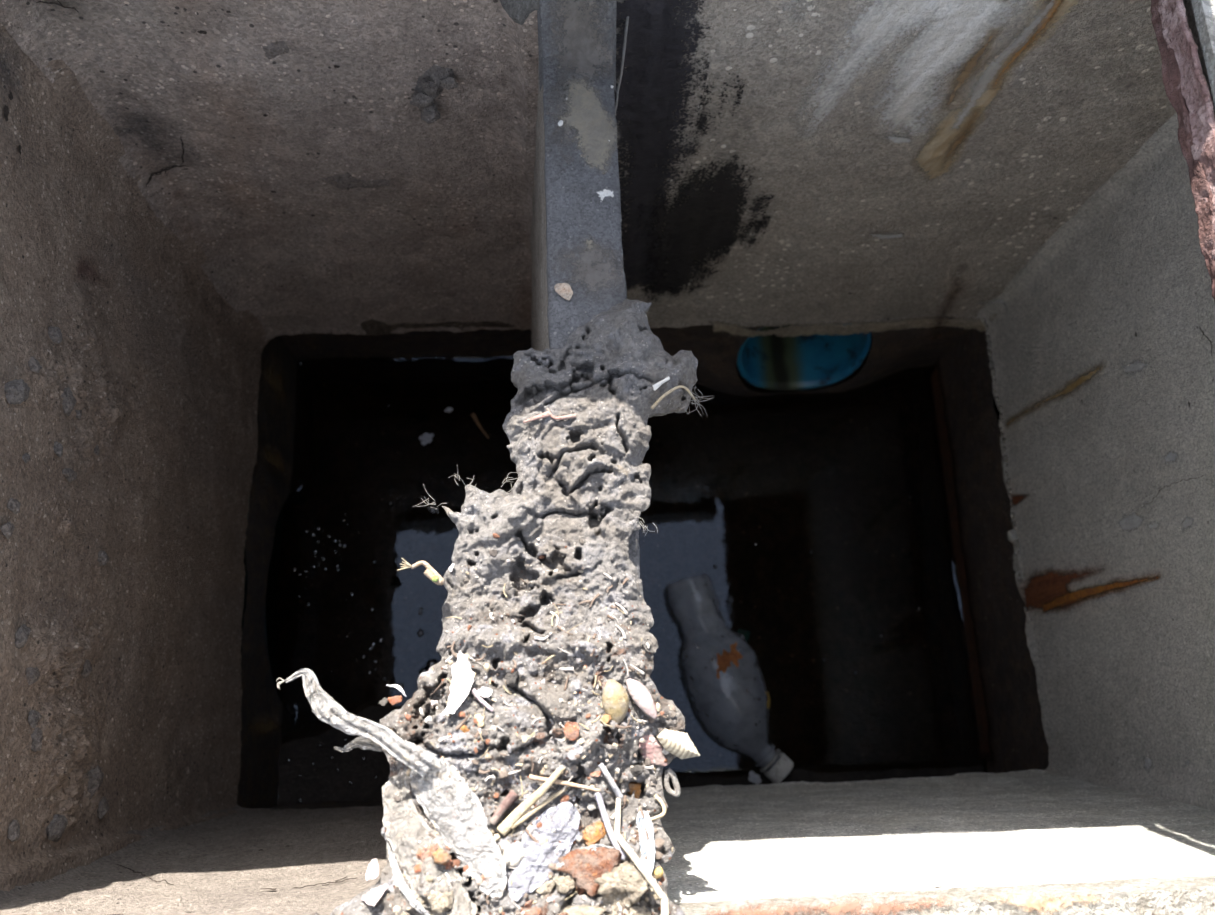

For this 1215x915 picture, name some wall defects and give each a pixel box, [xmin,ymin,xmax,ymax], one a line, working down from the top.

water stain [695,68,745,137]
corrosion [914,0,1079,180]
corrosion [1006,366,1102,426]
corrosion [1022,569,1159,612]